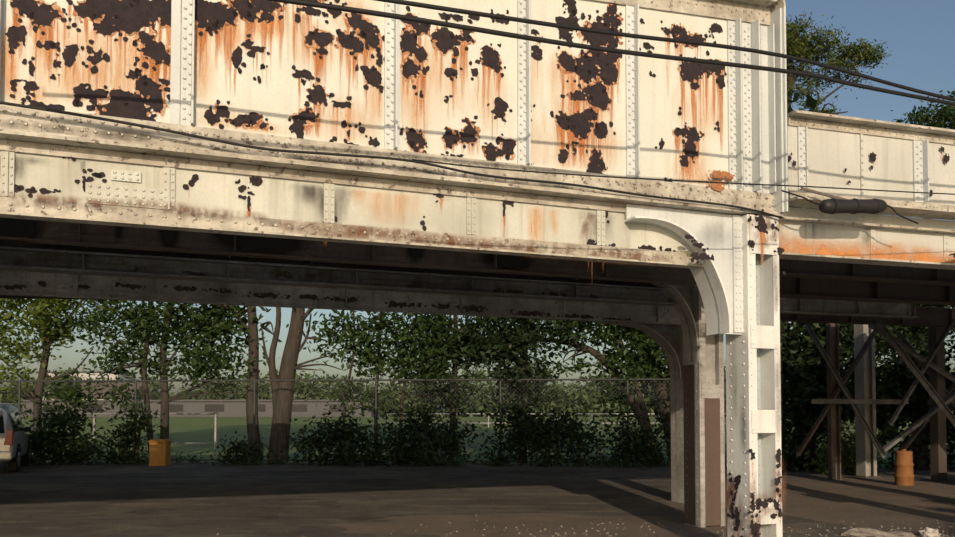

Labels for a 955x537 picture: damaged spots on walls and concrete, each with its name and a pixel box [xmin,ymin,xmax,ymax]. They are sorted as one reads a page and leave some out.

corrosion [255,13,279,33]
peeling [5,0,182,122]
corrosion [132,43,154,69]
peeling [194,0,385,139]
peeling [400,6,513,122]
peeling [550,0,624,174]
peeling [655,20,728,169]
peeling [441,115,517,161]
corrosion [37,196,76,205]
corrosion [164,204,227,218]
corrosion [706,170,739,192]
corrosion [779,241,955,263]